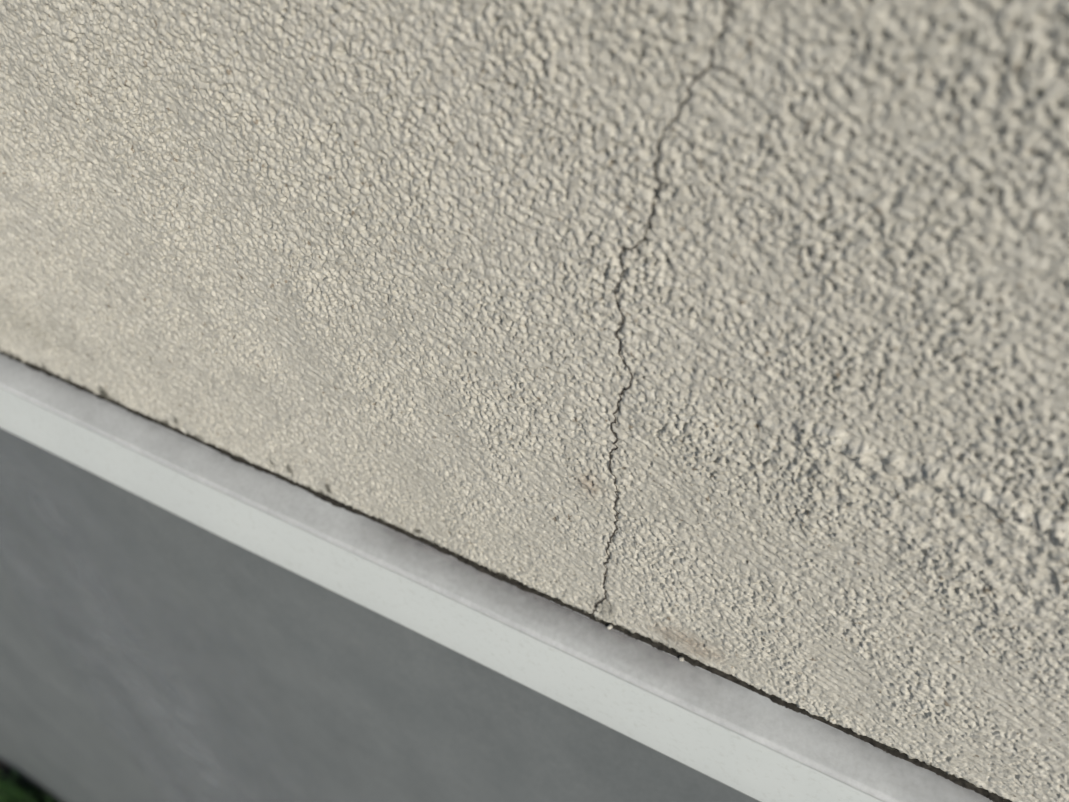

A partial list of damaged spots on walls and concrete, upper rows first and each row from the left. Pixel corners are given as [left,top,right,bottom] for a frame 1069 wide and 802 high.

crack [592,0,745,615]